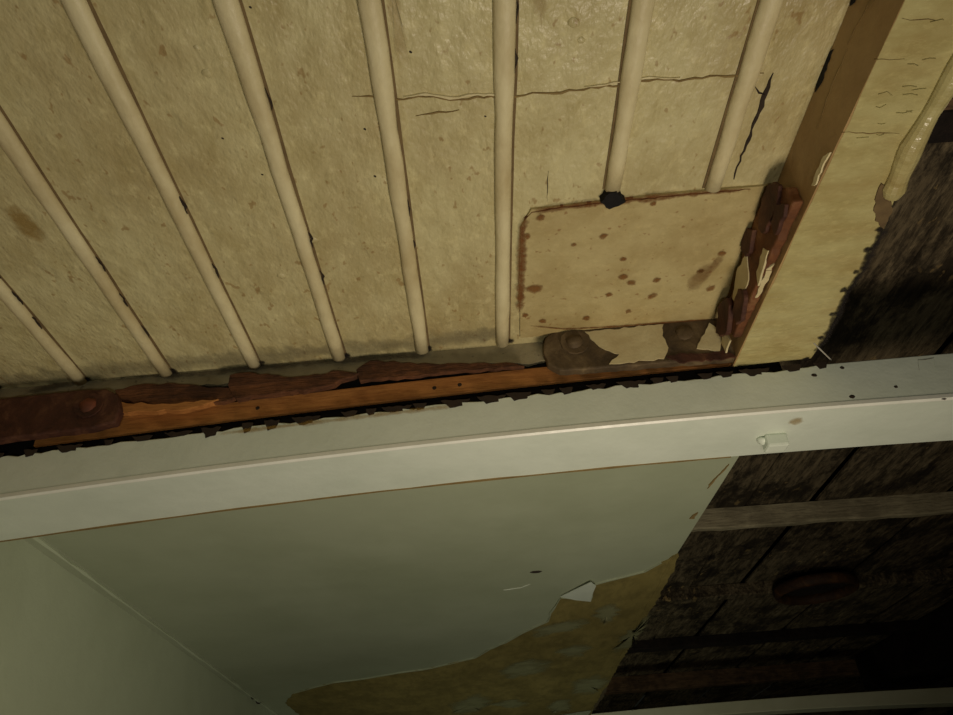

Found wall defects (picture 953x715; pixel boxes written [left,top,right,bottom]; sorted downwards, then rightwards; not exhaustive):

crack [352,73,774,179]
crack [842,129,899,137]
rust [625,189,751,206]
rust [517,201,602,318]
rust [539,316,705,330]
peeling [286,553,679,715]